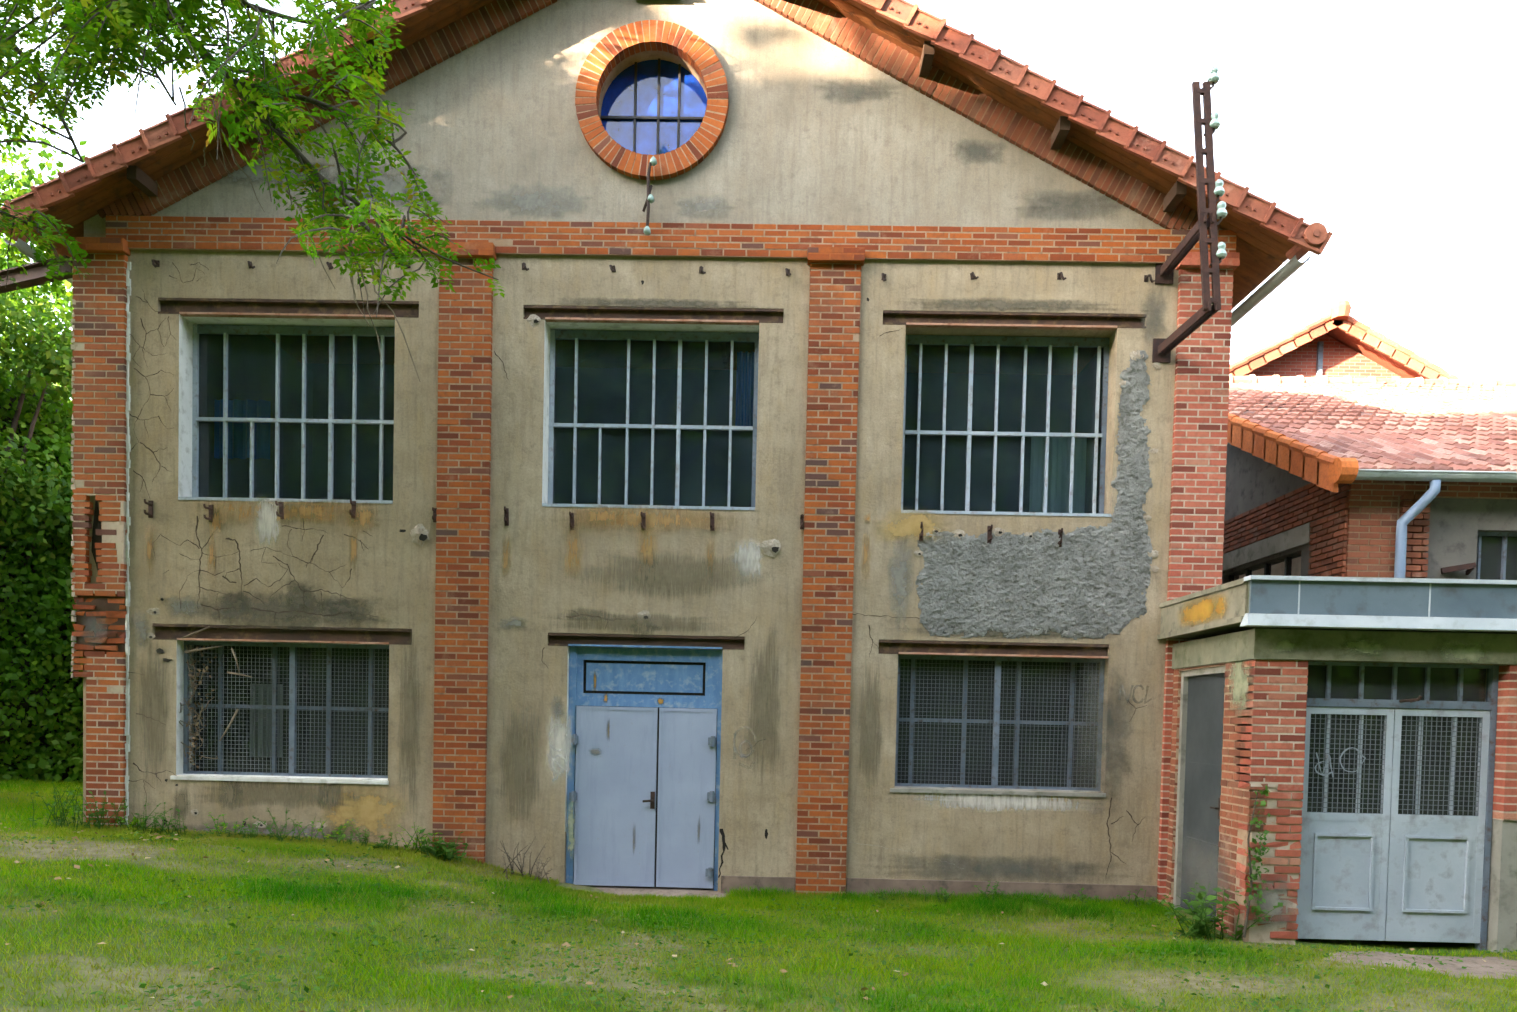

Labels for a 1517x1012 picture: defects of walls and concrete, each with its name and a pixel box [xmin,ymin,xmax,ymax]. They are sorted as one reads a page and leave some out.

crack [152,516,377,625]
corrosion [209,502,373,568]
corrosion [587,509,708,565]
peeling [913,350,1161,640]